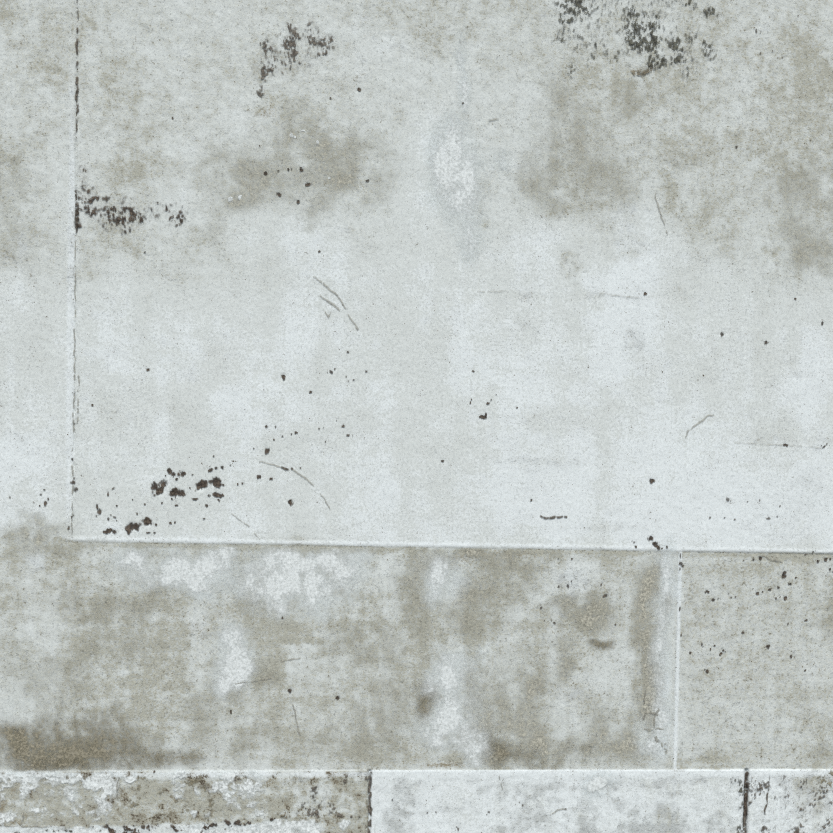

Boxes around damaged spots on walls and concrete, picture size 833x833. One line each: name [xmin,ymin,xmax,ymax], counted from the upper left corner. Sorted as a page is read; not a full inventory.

leakage [555,0,620,61]
leakage [617,1,715,75]
spalling [96,504,157,534]
spalling [151,465,231,507]
leakage [118,547,364,618]
leakage [406,552,494,631]
leakage [216,626,273,697]
leakage [582,557,672,756]
leakage [423,654,571,767]
peeling [0,771,149,833]
peeling [186,770,322,833]